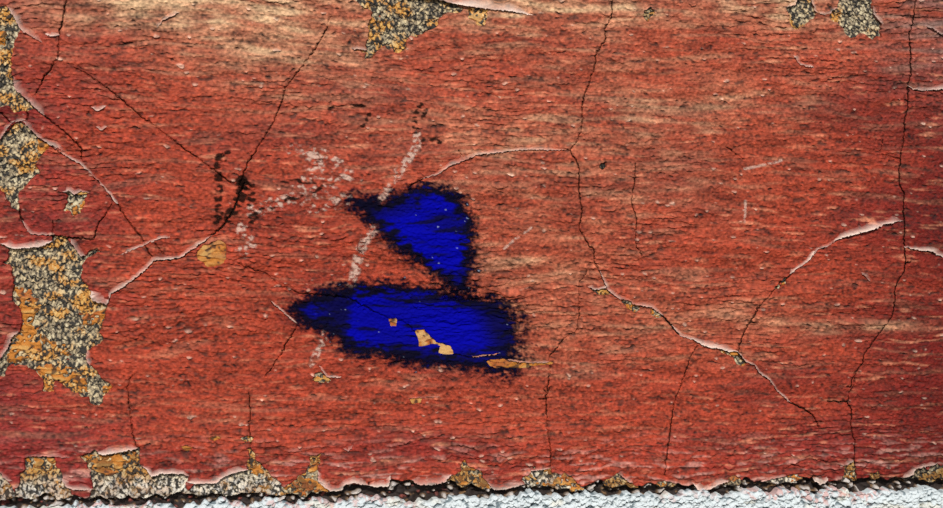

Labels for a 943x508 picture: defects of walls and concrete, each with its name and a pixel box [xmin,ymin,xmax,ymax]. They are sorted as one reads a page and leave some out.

flaking render [351,0,532,59]
flaking render [786,0,884,40]
flaking render [0,6,66,211]
crack [0,1,327,302]
crack [410,1,943,483]
flaking render [0,236,112,405]
crack [270,290,376,371]
flaking render [0,436,391,500]
flaking render [412,460,584,492]
peeling [692,475,744,490]
flaking render [761,474,828,485]
flaking render [902,462,943,482]